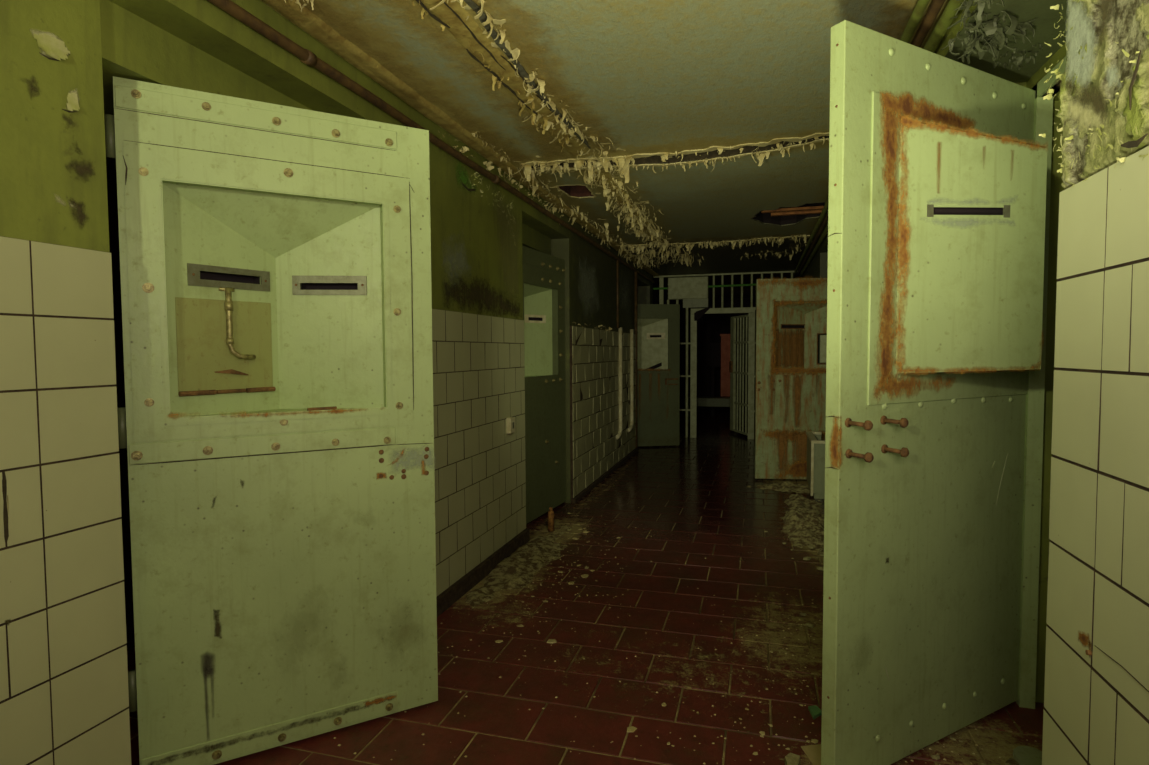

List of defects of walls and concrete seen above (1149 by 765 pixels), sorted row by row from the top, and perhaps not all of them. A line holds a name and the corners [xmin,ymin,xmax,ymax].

peeling [32,30,70,61]
water stain [1098,0,1111,45]
peeling [62,90,80,113]
water stain [1066,82,1105,118]
peeling [412,0,829,269]
corrosion [875,93,1041,396]
corrosion [758,278,827,478]
corrosion [821,418,842,467]